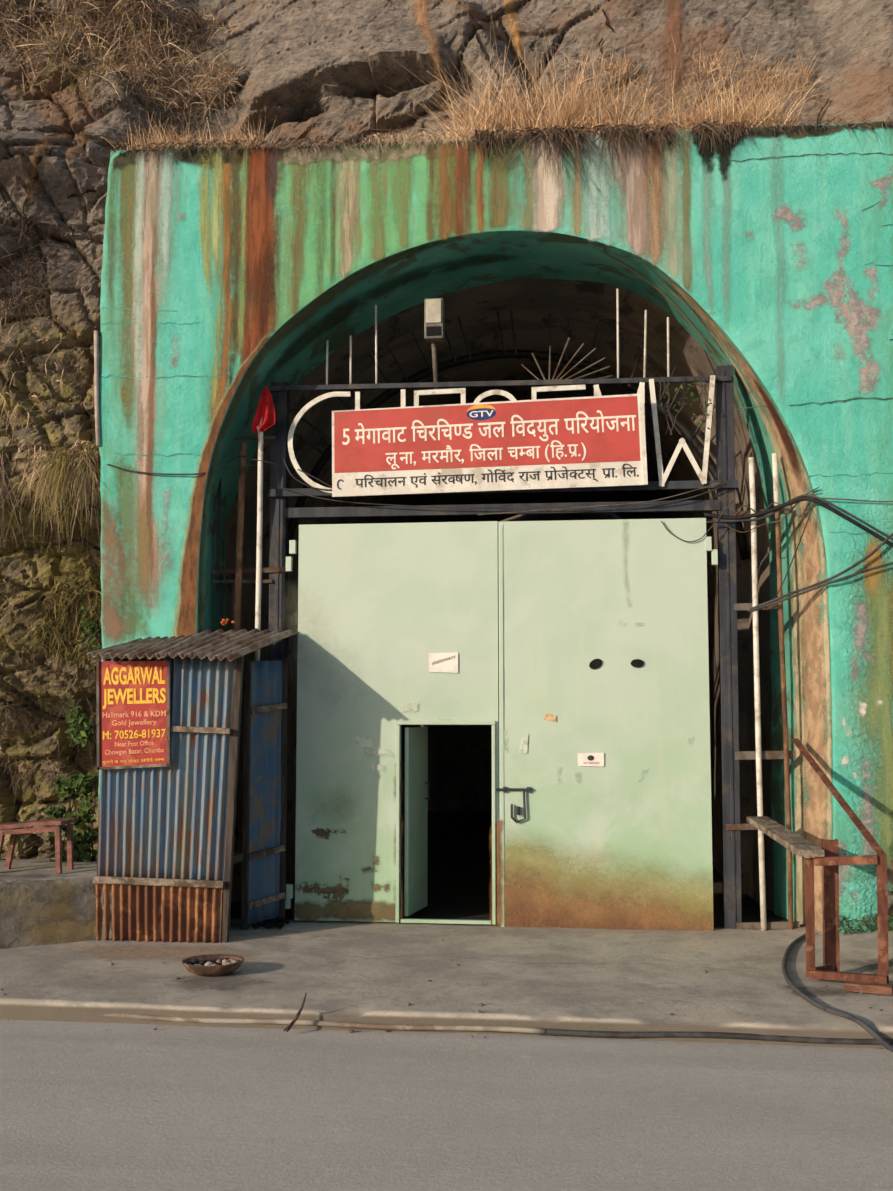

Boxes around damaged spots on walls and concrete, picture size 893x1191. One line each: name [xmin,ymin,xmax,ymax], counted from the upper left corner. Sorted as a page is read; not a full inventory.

corrosion [108,162,148,420]
leakage [484,130,730,366]
peeling [773,206,805,230]
crack [729,152,893,162]
peeling [793,210,879,393]
peeling [872,177,892,206]
corrosion [173,142,508,637]
corrosion [101,501,125,642]
corrosion [669,282,832,931]
corrosion [294,821,402,922]
corrosion [490,821,714,931]